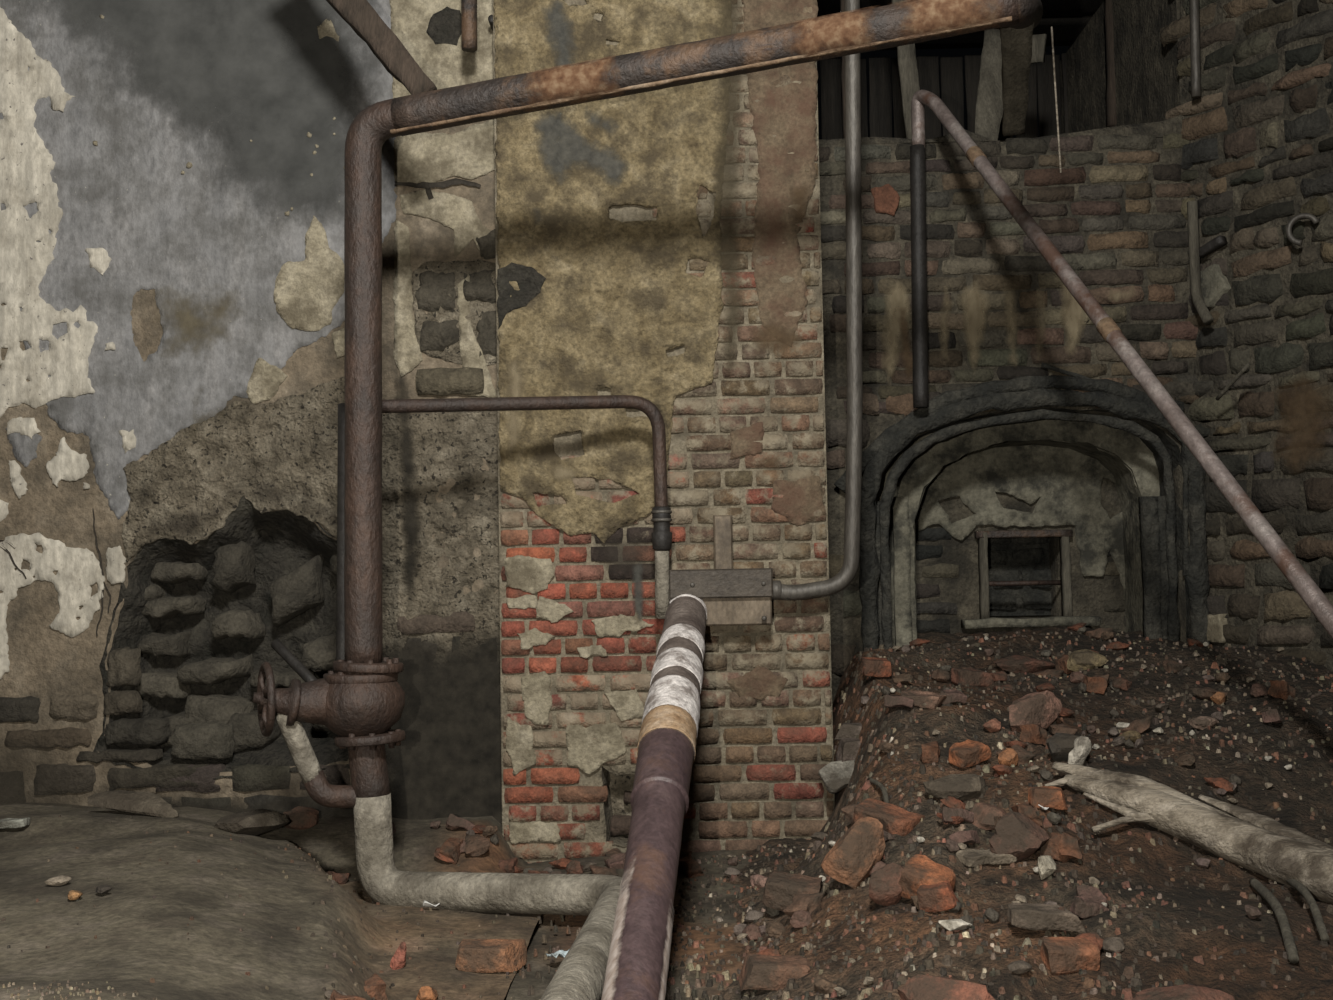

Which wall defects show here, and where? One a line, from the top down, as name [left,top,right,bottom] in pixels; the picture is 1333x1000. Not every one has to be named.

peeling [317,19,411,135]
flaking render [367,0,725,90]
flaking render [743,0,818,32]
flaking render [747,61,818,347]
peeling [0,0,350,779]
flaking render [382,78,729,658]
flaking render [730,422,764,459]
flaking render [771,475,826,526]
flaking render [506,671,552,776]
flaking render [566,689,644,847]
flaking render [509,821,561,844]